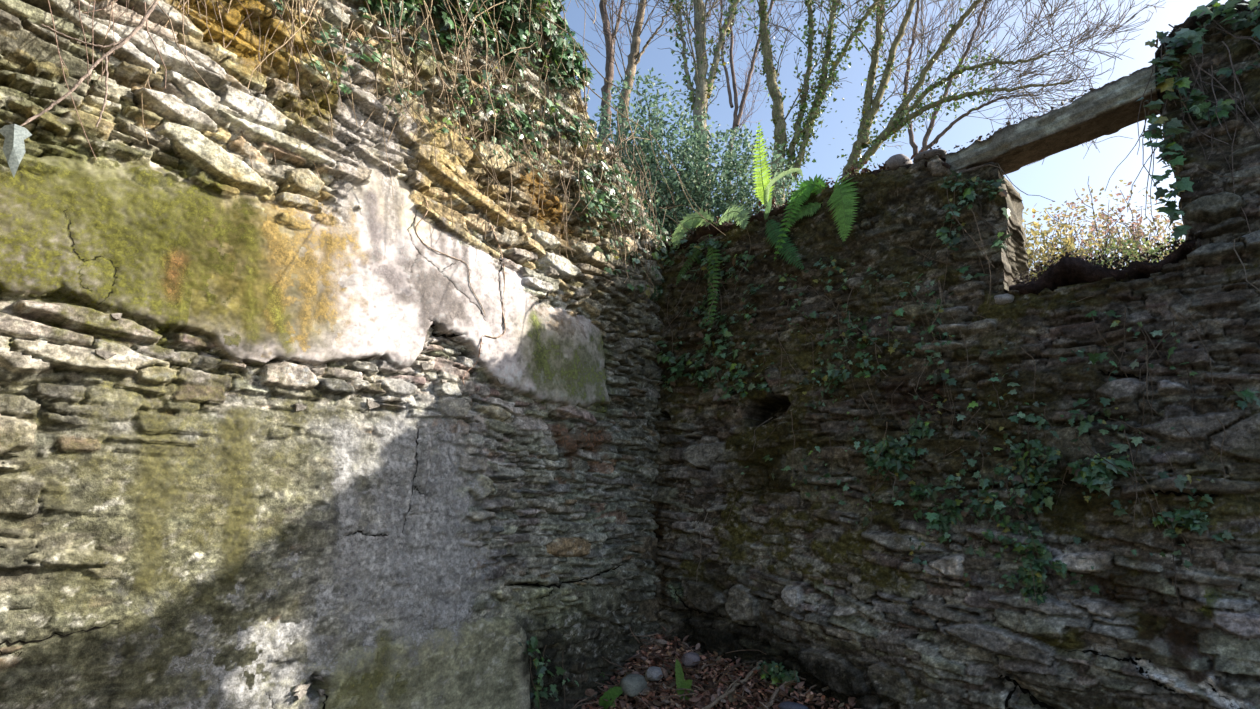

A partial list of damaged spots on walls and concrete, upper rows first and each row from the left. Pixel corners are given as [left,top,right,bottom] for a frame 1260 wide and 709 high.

spalling [68,304,506,415]
damp [141,411,168,586]
damp [184,387,488,709]
spalling [459,427,653,627]